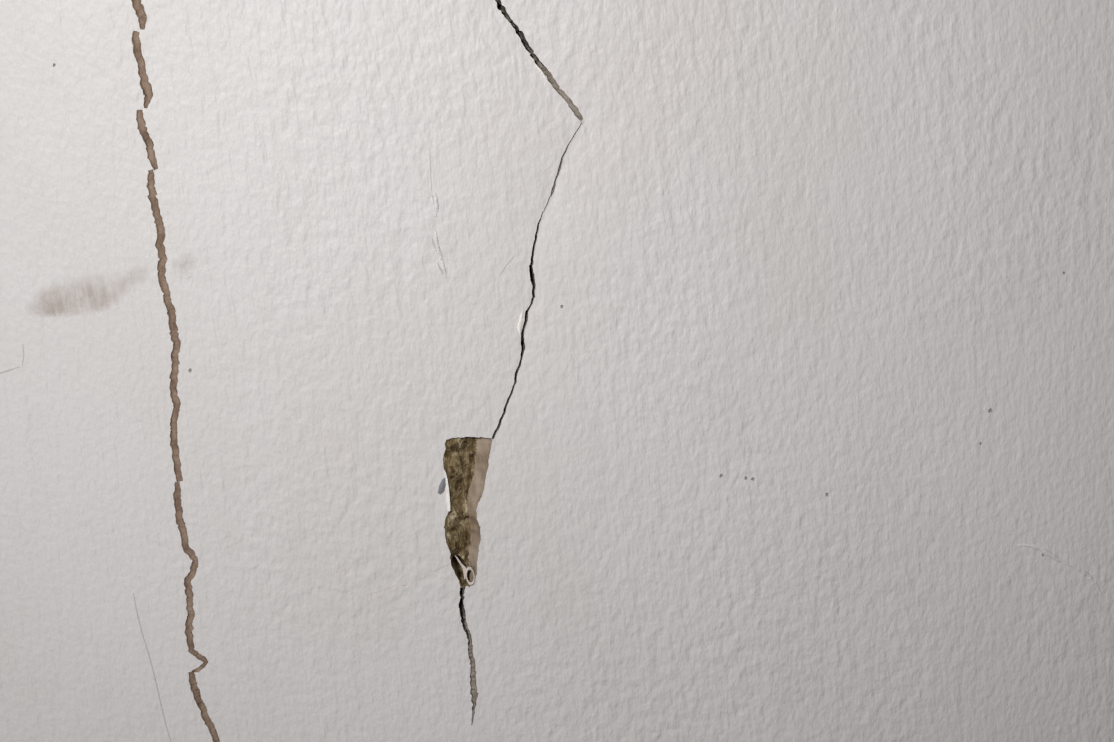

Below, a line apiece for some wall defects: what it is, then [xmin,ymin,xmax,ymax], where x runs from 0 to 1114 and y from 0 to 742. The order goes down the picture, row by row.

crack [131,0,220,742]
crack [429,148,447,278]
spalling [438,437,492,589]
crack [492,0,583,439]